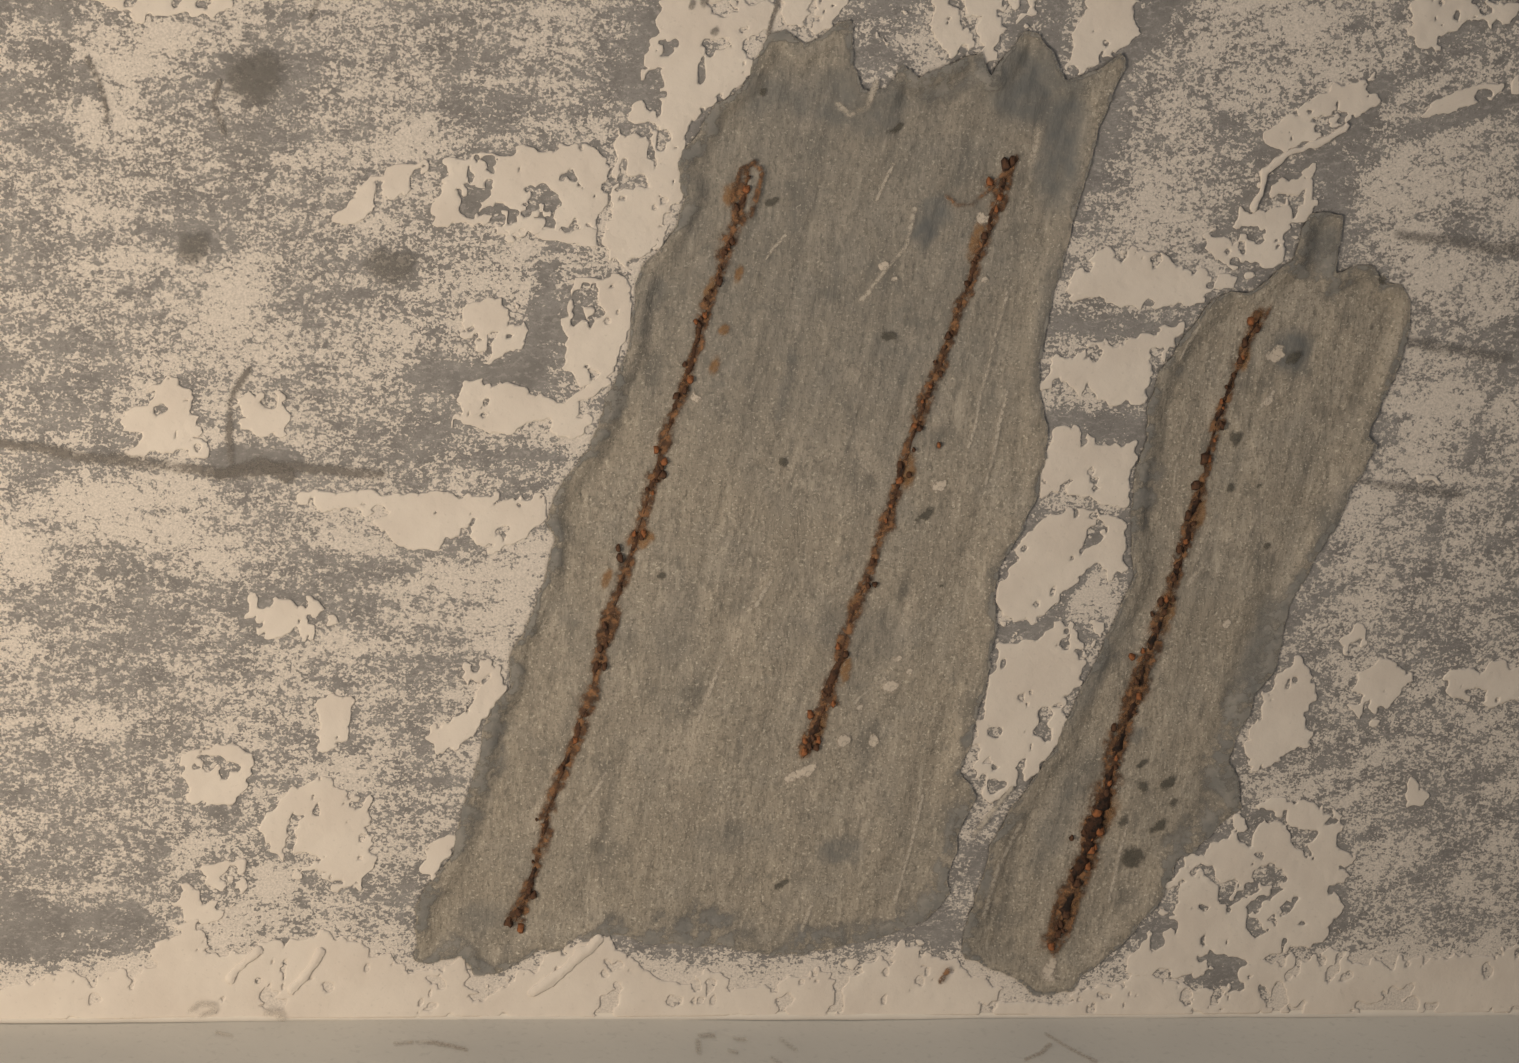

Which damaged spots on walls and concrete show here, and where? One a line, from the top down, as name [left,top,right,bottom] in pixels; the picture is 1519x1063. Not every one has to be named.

peeling [331,159,429,225]
peeling [120,375,210,461]
crack [0,368,383,483]
peeling [297,489,547,554]
corrosion [503,160,764,934]
corrosion [798,155,1019,758]
spalling [413,0,1519,1016]
peeling [244,593,339,642]
corrosion [1041,308,1271,958]
peeling [180,743,254,806]
peeling [259,776,378,892]
peeling [0,882,835,1019]